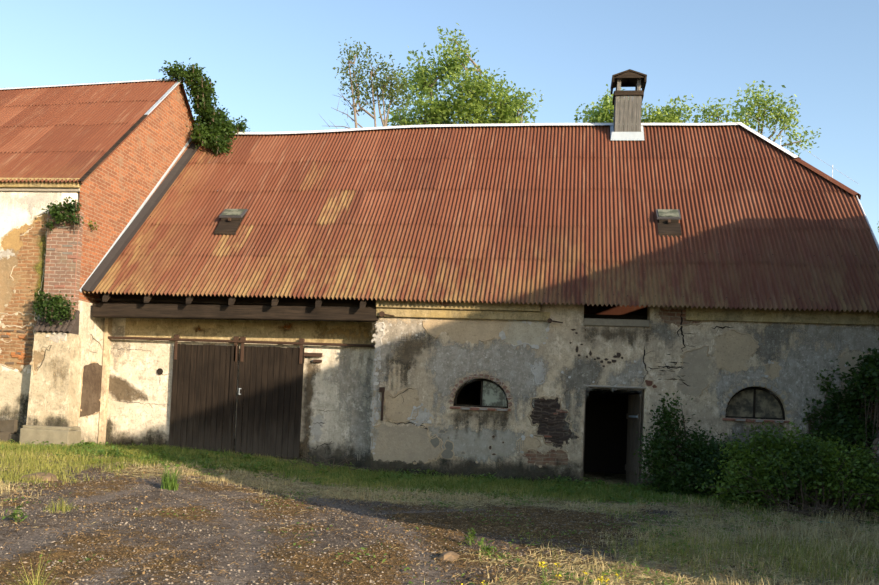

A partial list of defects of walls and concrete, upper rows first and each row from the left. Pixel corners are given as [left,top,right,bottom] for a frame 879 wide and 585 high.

flaking render [0,212,48,416]
peeling [46,331,67,343]